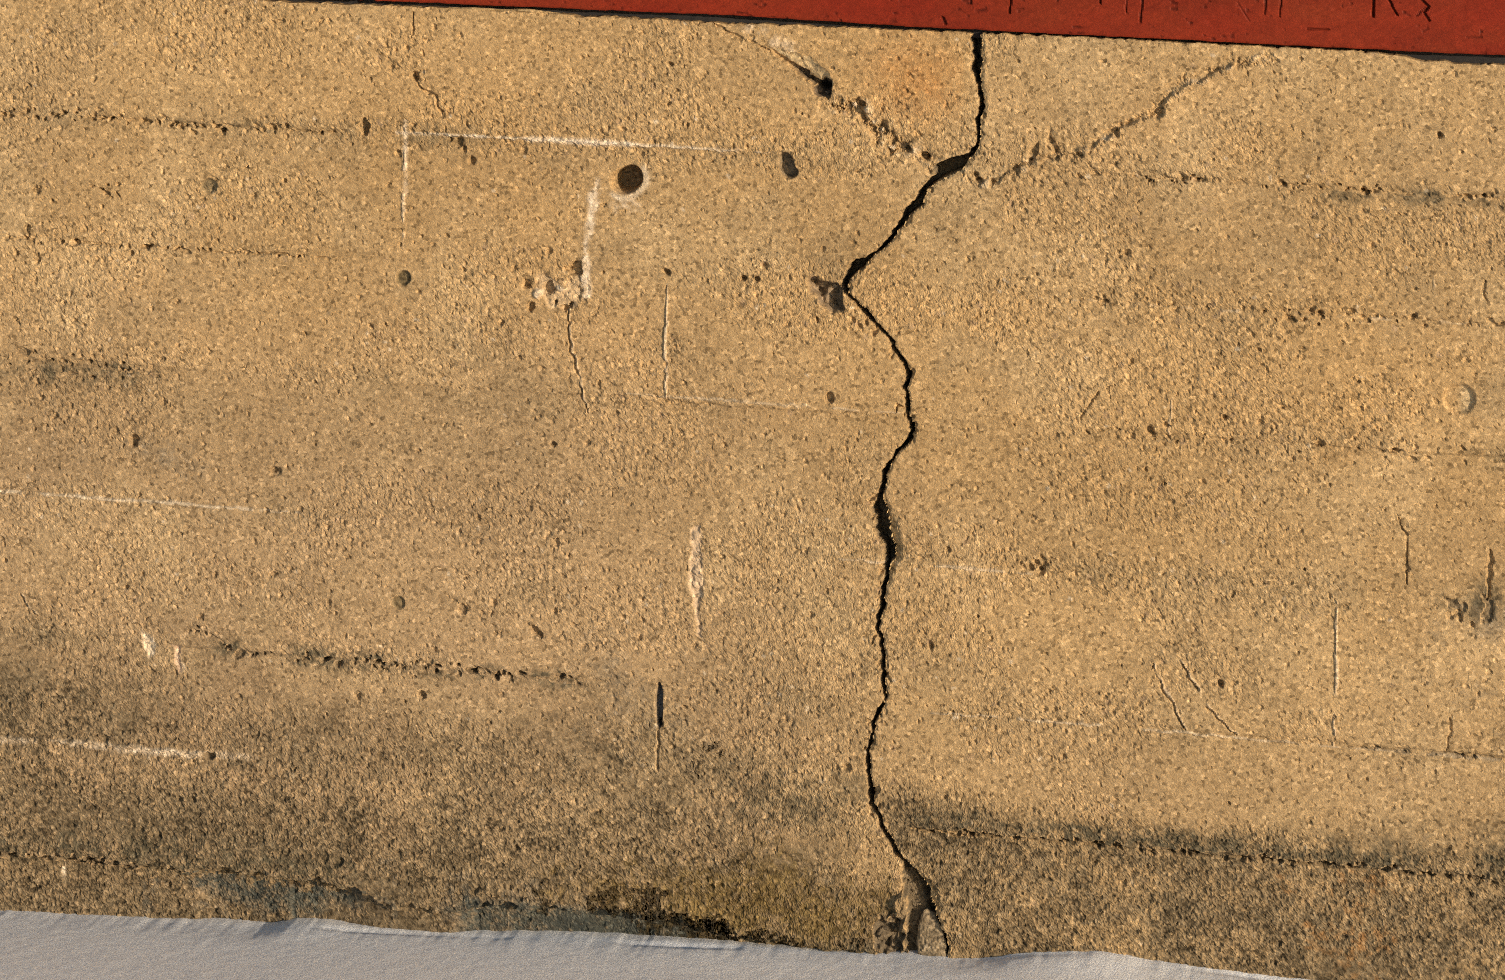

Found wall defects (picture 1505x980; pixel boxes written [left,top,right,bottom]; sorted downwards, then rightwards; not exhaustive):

crack [711,0,1283,958]